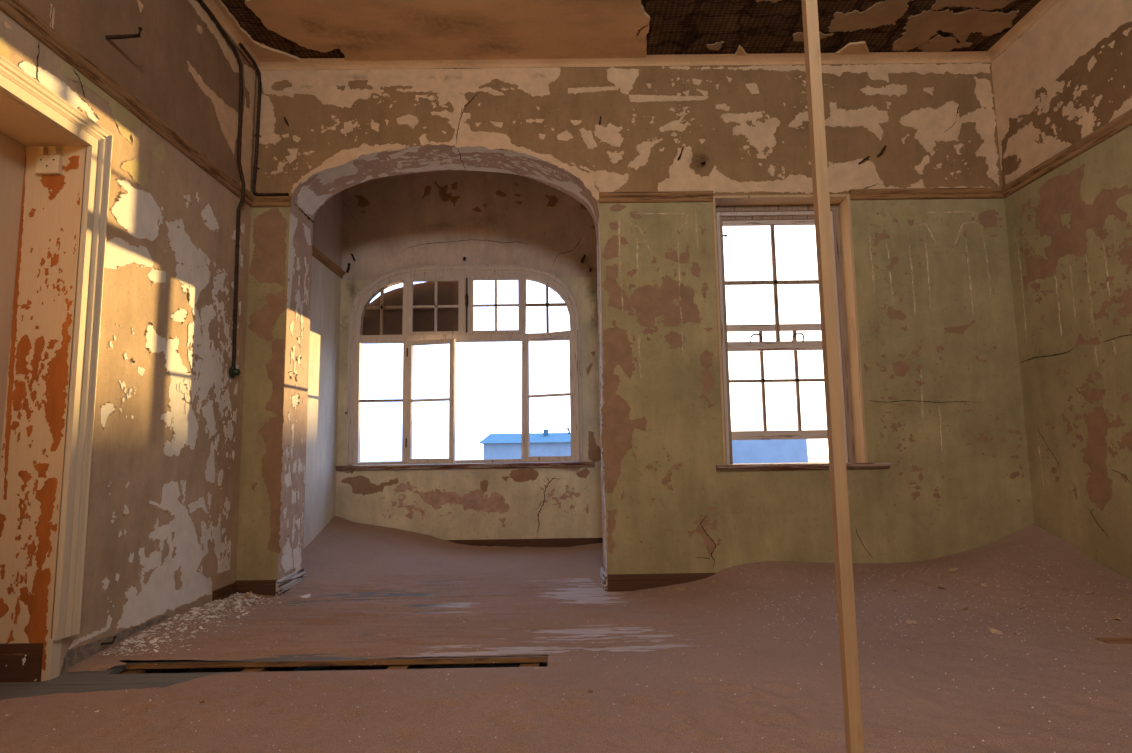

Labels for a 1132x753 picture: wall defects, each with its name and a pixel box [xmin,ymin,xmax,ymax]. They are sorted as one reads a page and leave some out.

peeling [0,21,142,145]
peeling [821,0,1132,193]
peeling [0,155,80,681]
peeling [60,0,813,675]
crack [537,477,561,533]
crack [696,517,716,567]